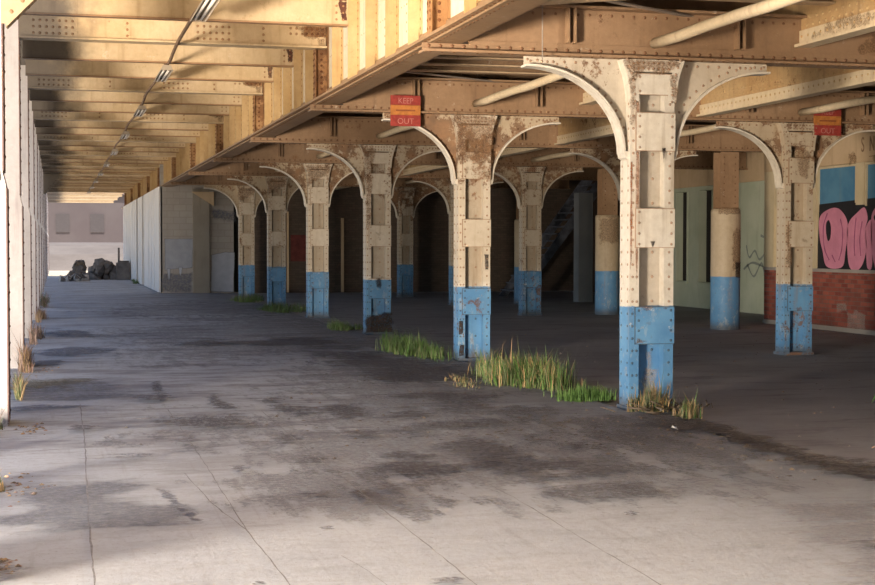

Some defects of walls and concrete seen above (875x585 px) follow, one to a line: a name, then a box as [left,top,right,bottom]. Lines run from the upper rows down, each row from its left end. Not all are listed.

corrosion [626,59,680,124]
corrosion [454,115,496,171]
corrosion [630,152,639,271]
damp [530,458,668,498]